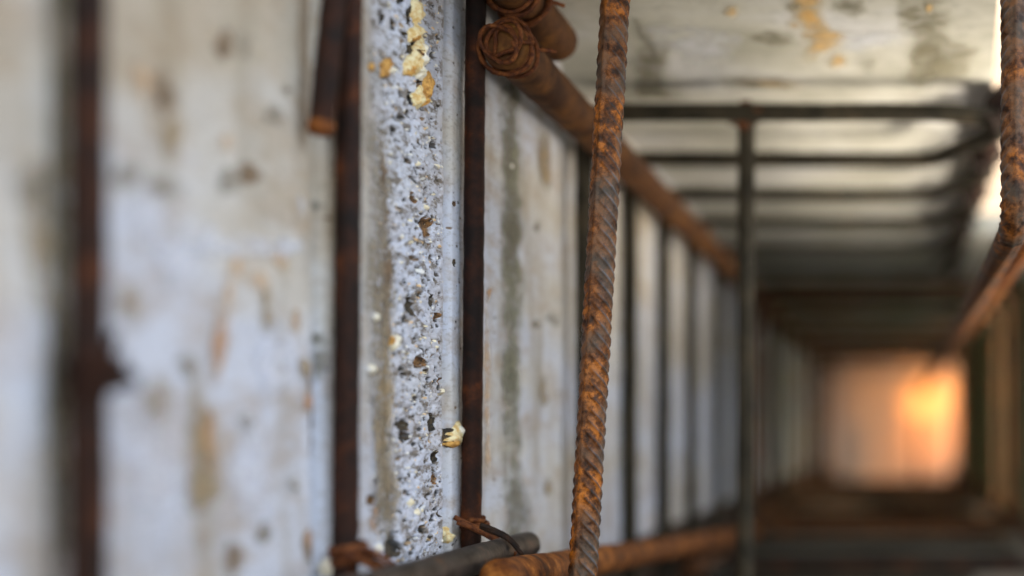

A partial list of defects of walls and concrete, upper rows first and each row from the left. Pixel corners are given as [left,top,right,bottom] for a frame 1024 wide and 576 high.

rust [791,0,845,66]